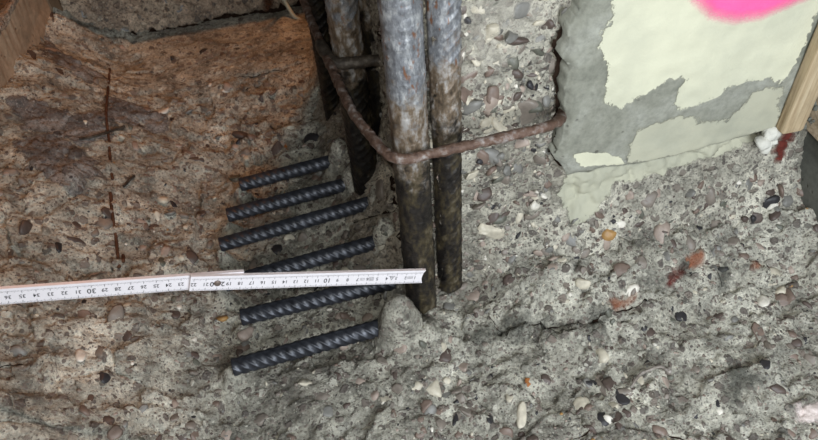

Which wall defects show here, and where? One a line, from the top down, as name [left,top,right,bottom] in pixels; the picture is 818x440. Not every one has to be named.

crack [131,0,301,35]
spalling [218,0,818,326]
crack [531,299,657,329]